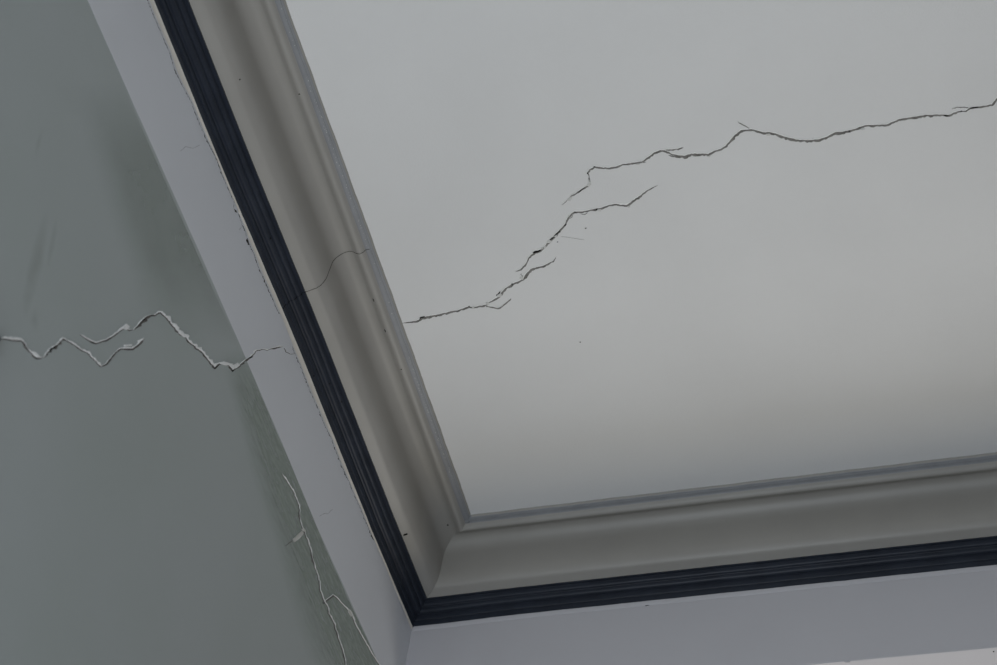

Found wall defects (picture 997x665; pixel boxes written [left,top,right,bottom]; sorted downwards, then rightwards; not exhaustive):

crack [403,97,997,323]
crack [1,311,374,540]
crack [282,474,380,665]